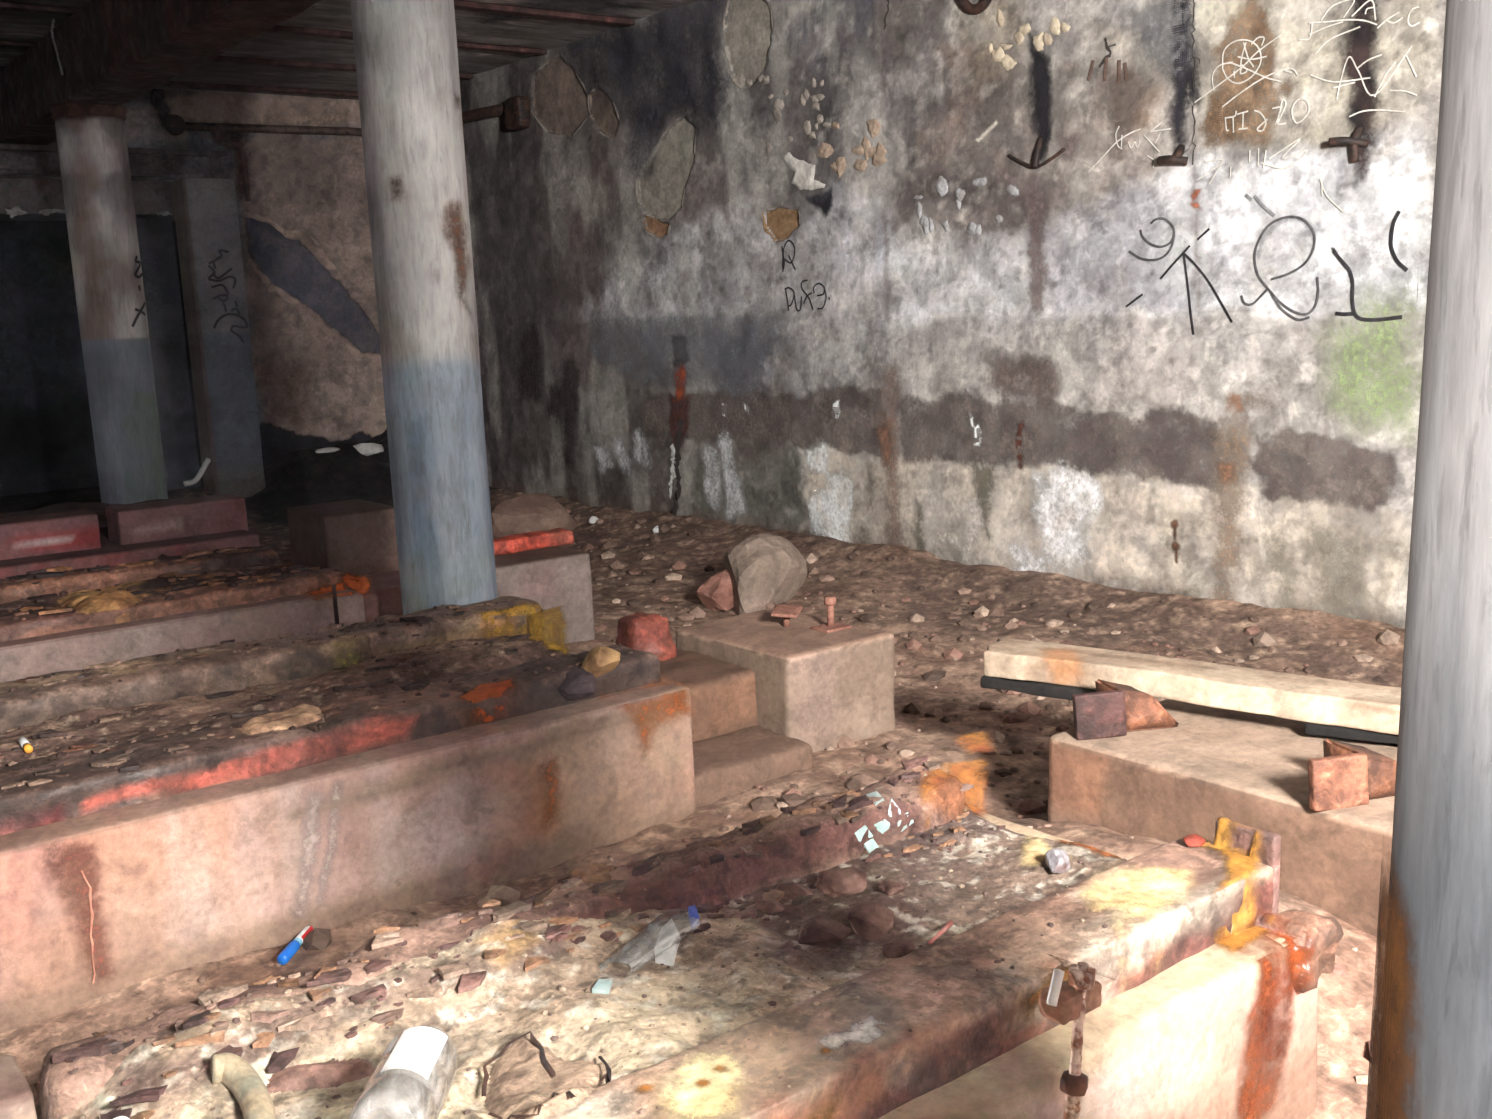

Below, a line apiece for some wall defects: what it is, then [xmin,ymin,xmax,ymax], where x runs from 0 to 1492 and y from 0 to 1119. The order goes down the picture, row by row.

water stain [1353,0,1377,15]
flaking render [243,212,381,357]
rust [444,203,469,303]
flaking render [635,115,697,239]
flaking render [760,205,801,245]
flaking render [722,0,887,190]
water stain [1355,141,1370,181]
water stain [591,315,1222,572]
water stain [1251,429,1397,511]
rust [47,845,111,983]
rust [1202,817,1313,1119]
rust [1366,869,1414,1119]